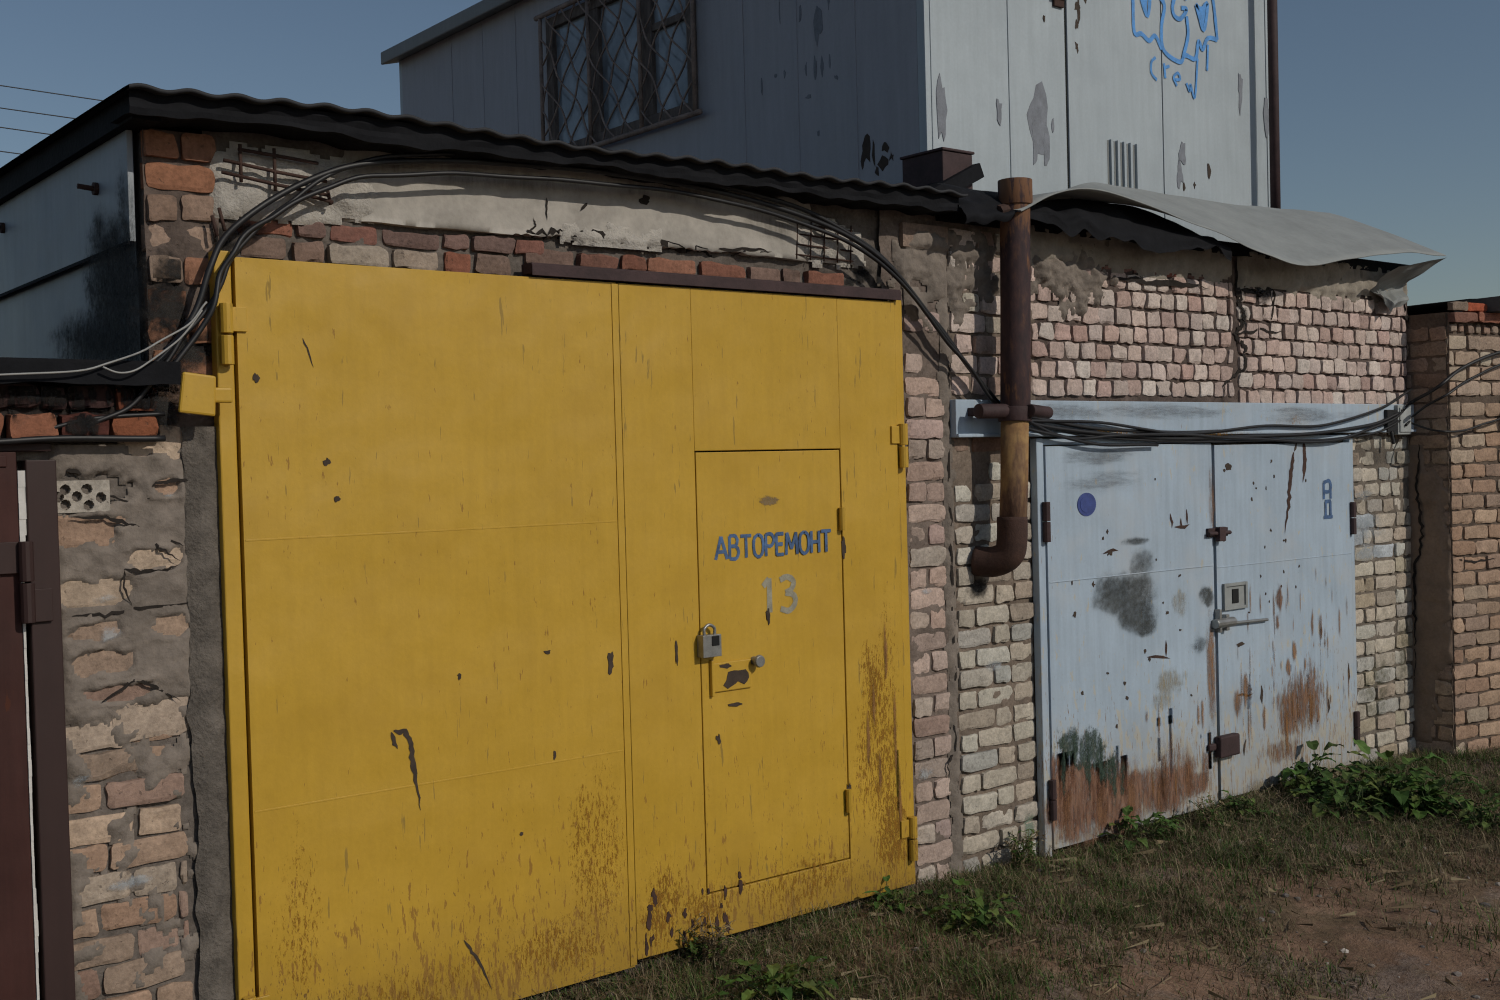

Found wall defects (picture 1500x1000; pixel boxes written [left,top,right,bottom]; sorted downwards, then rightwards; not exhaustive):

peeling [861,134,894,176]
spalling [560,222,662,252]
spalling [795,218,866,270]
crack [1117,263,1282,399]
crack [1412,445,1424,686]
crack [1459,557,1495,565]
flaking render [49,444,200,1000]
corrosion [855,605,912,873]
corrosion [1044,715,1209,845]
peeling [1144,595,1193,707]
corrosion [1234,588,1348,762]
corrosion [637,852,864,962]